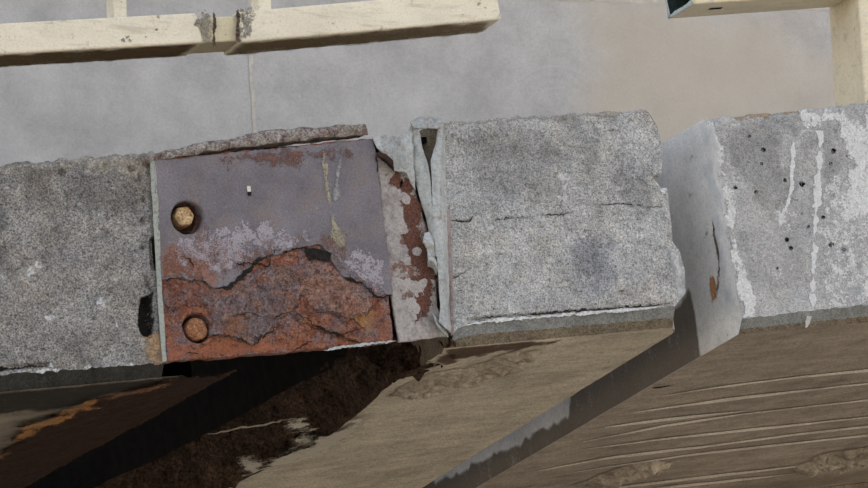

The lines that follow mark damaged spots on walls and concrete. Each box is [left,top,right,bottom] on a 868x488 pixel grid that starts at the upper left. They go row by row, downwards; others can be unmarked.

damp [444,0,847,328]
spalling [29,139,443,488]
crack [164,244,317,290]
corrosion [144,226,392,364]
crack [187,262,391,354]
corrosion [386,171,439,324]
spalling [438,333,460,359]
damp [422,226,702,488]